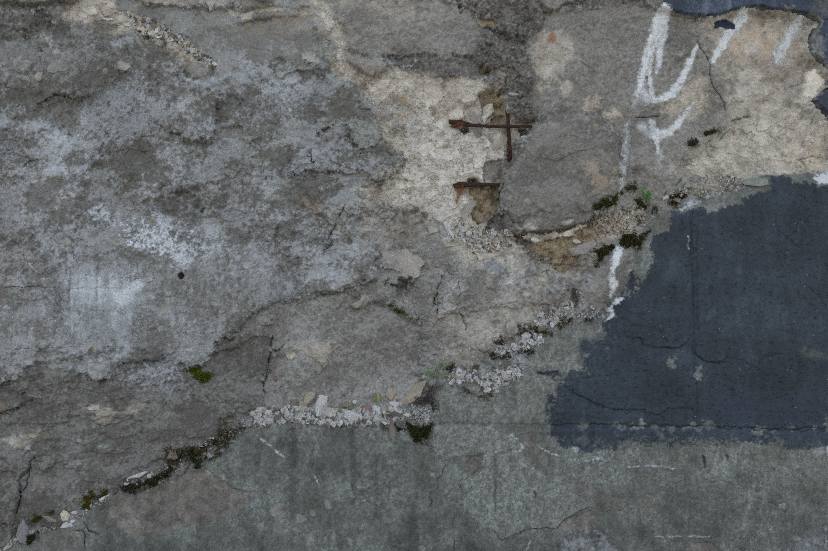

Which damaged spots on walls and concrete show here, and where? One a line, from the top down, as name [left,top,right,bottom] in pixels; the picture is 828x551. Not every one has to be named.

corrosion [449,110,532,162]
spalling [297,0,828,273]
spalling [0,0,613,551]
crack [534,370,828,432]